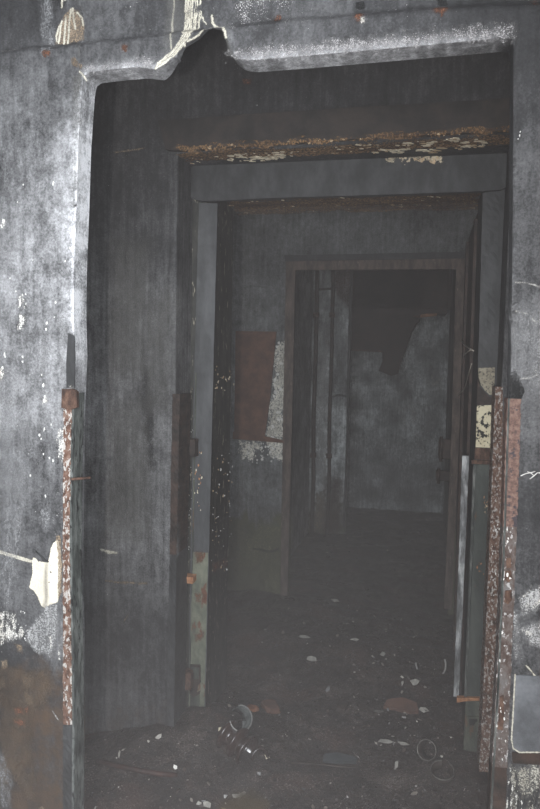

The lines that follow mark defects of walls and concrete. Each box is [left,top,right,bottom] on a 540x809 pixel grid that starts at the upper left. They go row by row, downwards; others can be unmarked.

spalling [55,8,84,45]
damp [79,0,264,81]
damp [225,23,517,62]
peeling [176,126,509,165]
peeling [213,341,284,504]
peeling [29,536,62,608]
peeling [0,611,28,652]
peeling [502,758,540,809]